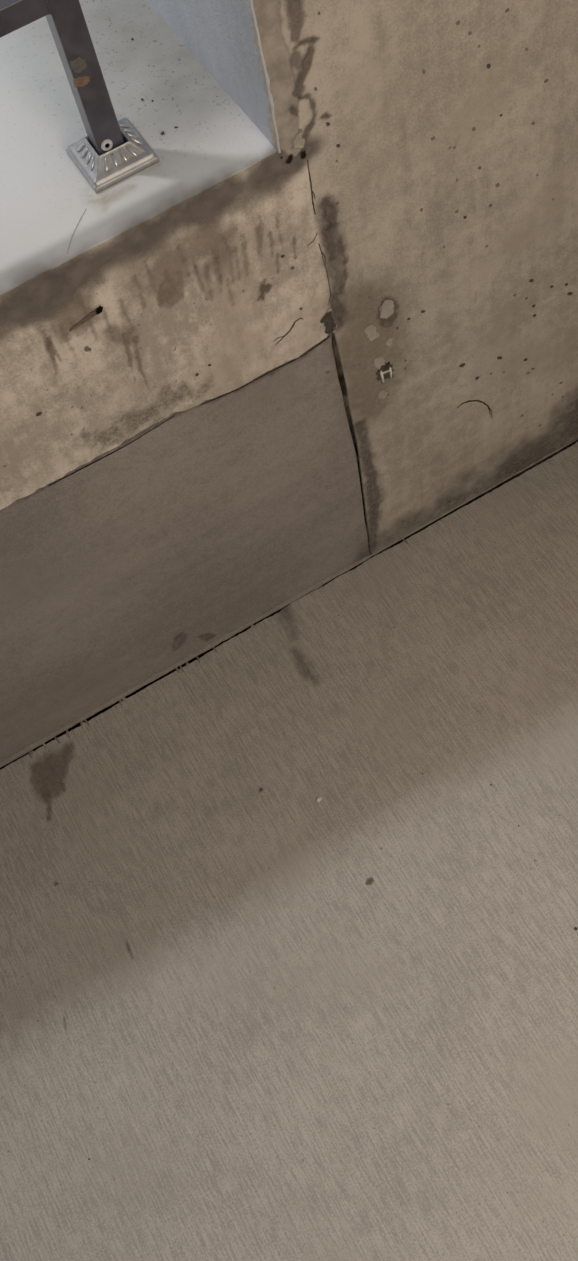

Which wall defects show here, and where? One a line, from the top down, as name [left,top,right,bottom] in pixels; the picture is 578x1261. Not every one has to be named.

crack [0,160,578,770]
leakage [319,196,396,550]